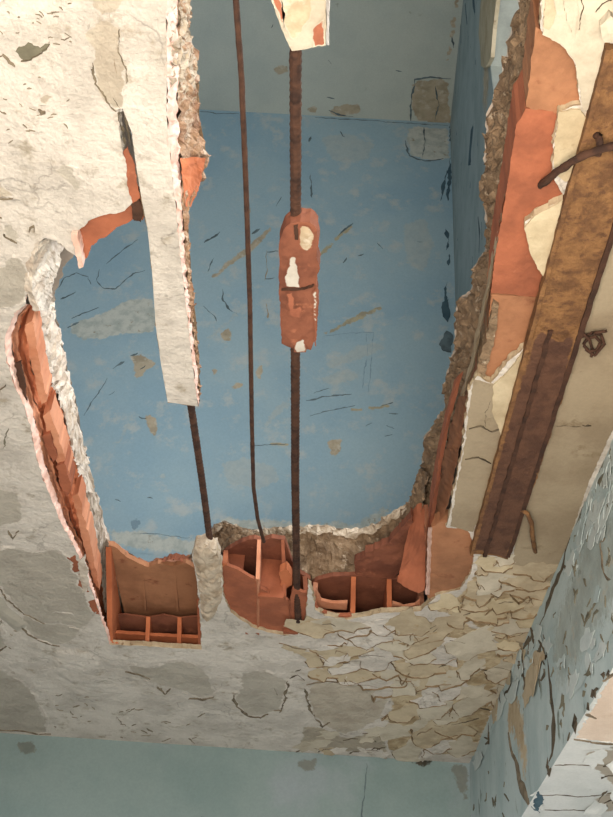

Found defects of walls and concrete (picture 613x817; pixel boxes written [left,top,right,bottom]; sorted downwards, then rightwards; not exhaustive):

peeling [0,217,35,244]
peeling [49,160,83,192]
spalling [123,147,140,204]
spalling [212,0,578,580]
spalling [0,254,110,652]
peeling [276,246,613,817]
rust [475,326,579,559]